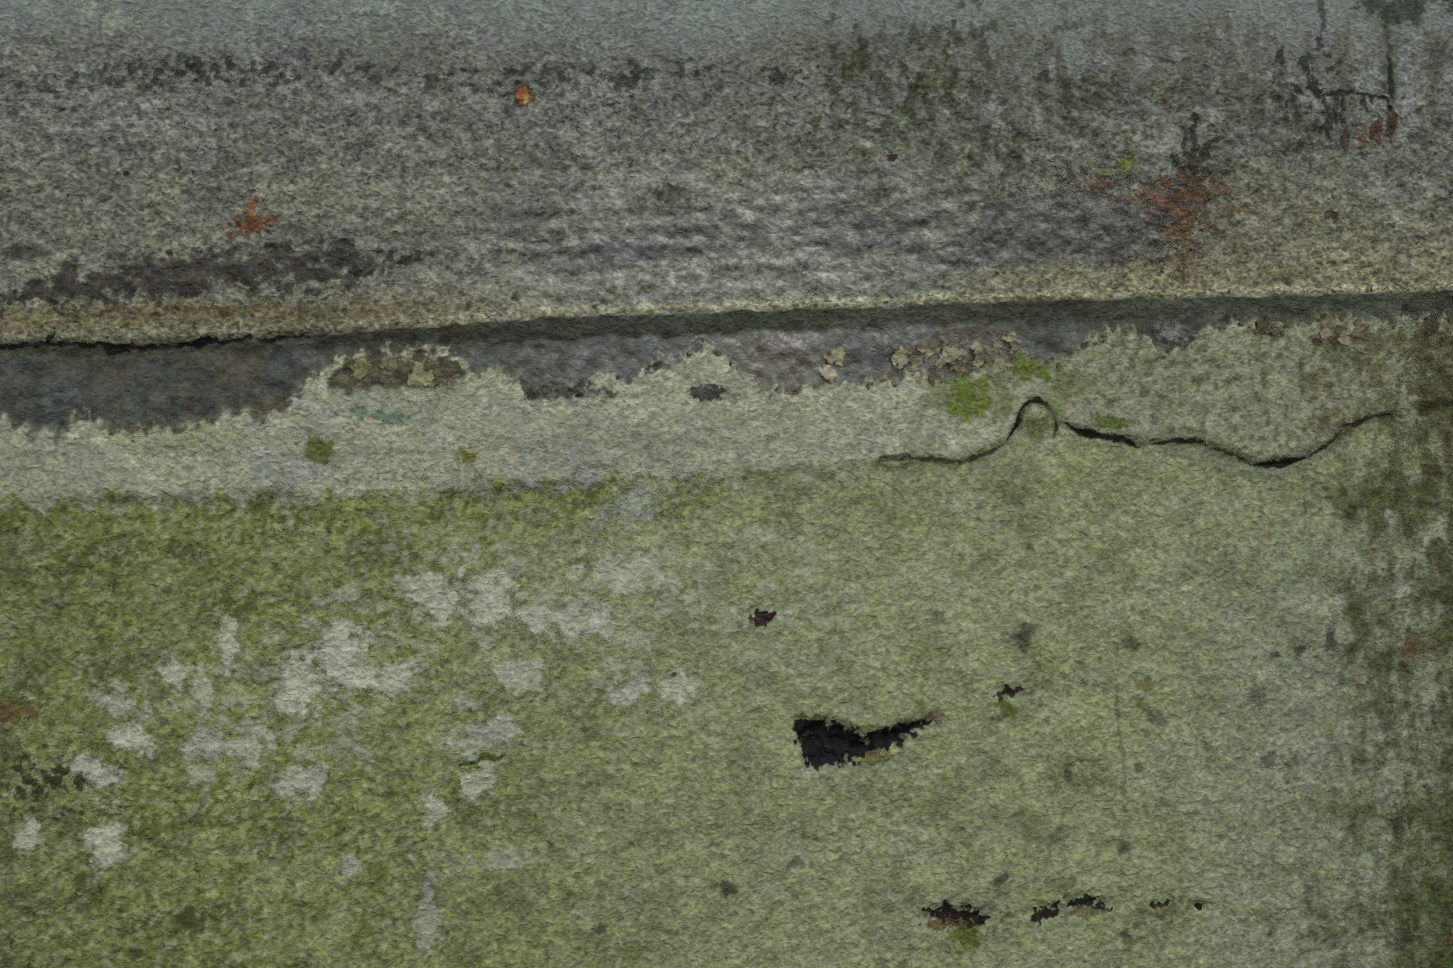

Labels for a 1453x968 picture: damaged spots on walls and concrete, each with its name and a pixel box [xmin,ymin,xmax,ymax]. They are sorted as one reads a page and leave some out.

corrosion [1340,106,1398,153]
corrosion [222,196,278,238]
corrosion [1074,162,1282,242]
water stain [0,237,431,313]
spalling [327,350,470,395]
spalling [690,384,726,401]
crack [1007,396,1208,448]
crack [1342,411,1398,428]
water stain [1407,317,1453,511]
crack [1254,457,1306,468]
spalling [920,899,991,955]
spalling [1031,893,1113,925]